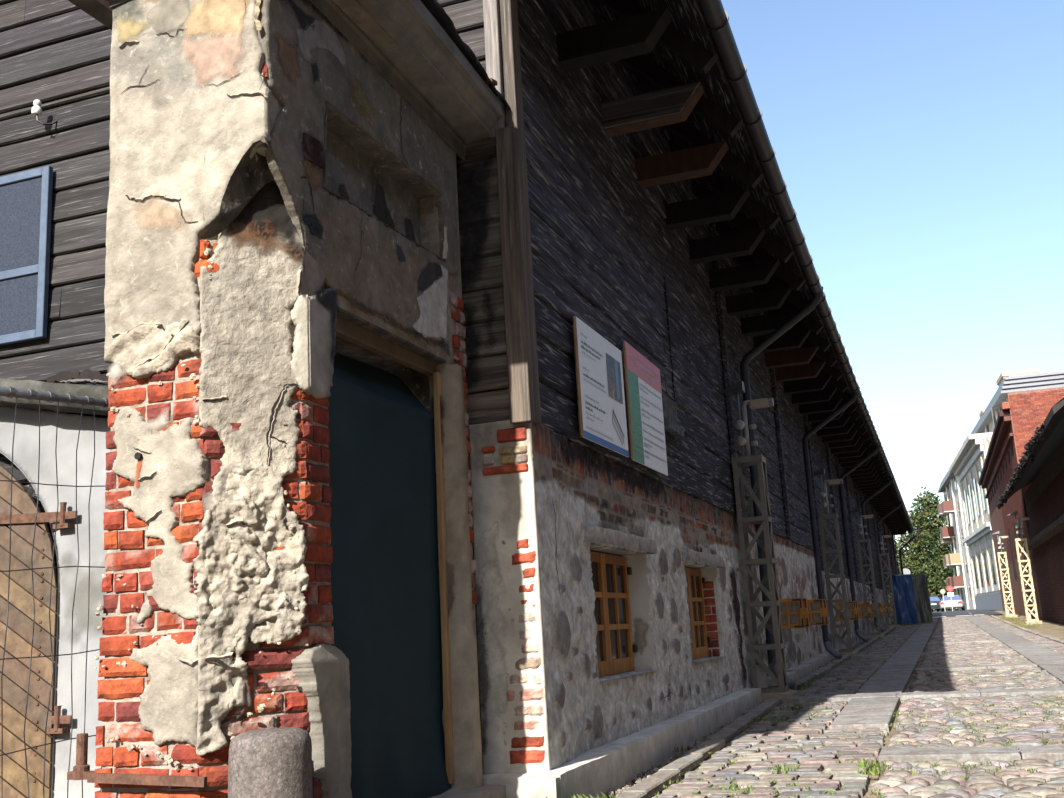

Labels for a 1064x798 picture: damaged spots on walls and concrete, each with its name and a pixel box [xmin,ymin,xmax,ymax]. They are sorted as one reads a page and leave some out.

crack [119,28,186,95]
peeling [296,19,346,66]
crack [125,194,198,223]
crack [202,383,299,465]
flaking render [94,353,334,798]
flaking render [502,539,545,764]